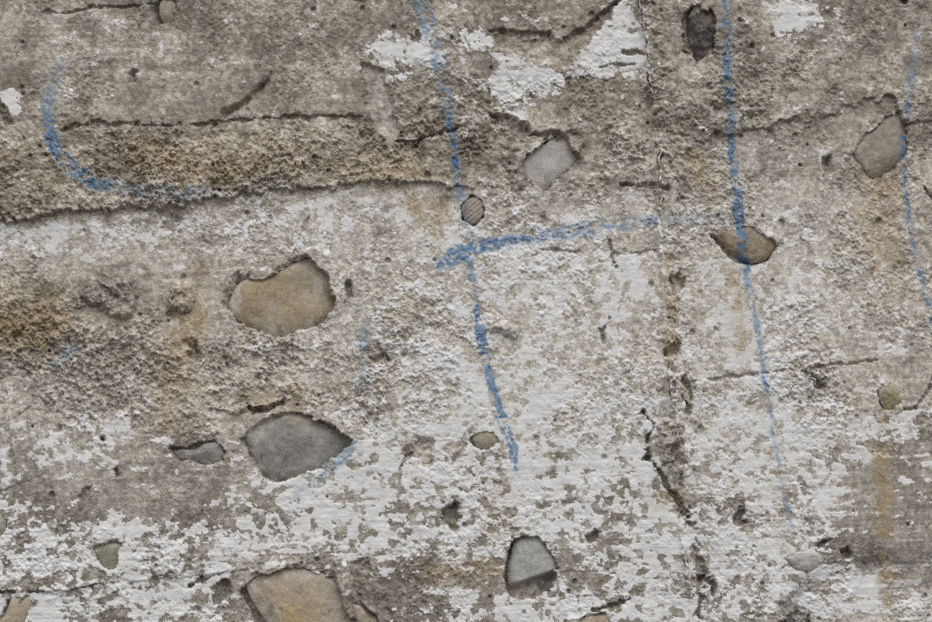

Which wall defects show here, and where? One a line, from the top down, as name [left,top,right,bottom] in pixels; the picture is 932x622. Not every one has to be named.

spalling [0,101,16,127]
spalling [128,68,141,84]
spalling [215,70,273,123]
peeling [0,213,172,262]
peeling [224,195,413,256]
spalling [221,270,245,311]
spalling [336,277,355,309]
spalling [181,337,204,366]
crack [903,376,932,412]
peeling [0,430,463,622]
peeling [475,436,686,622]
crack [637,408,720,622]